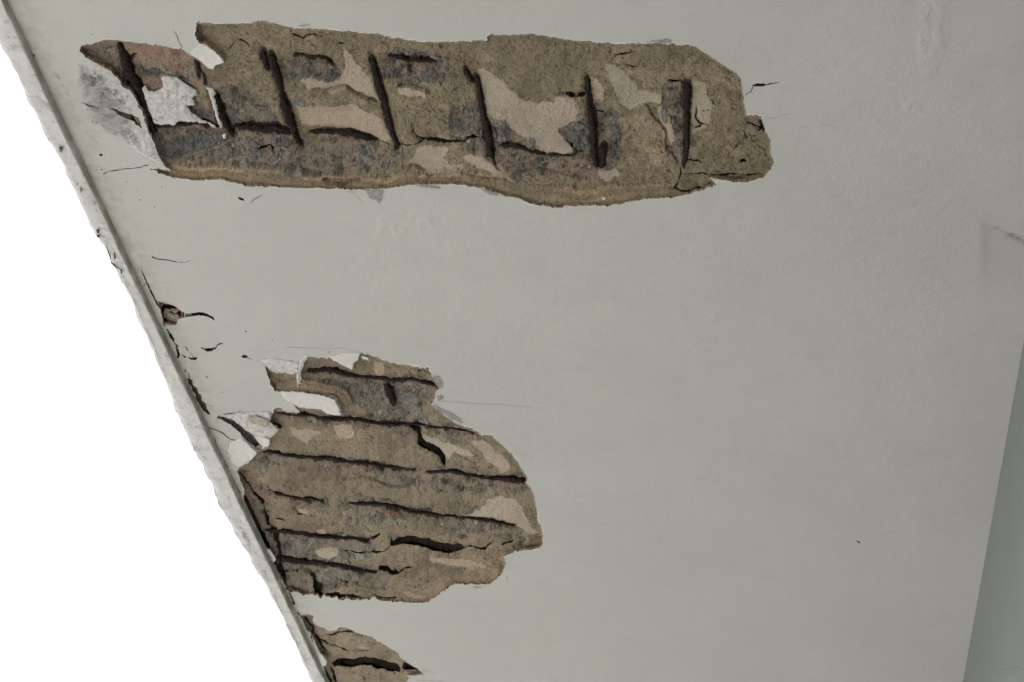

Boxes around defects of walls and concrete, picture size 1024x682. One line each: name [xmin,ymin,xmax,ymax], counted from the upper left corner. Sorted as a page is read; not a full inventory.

spalling [79,20,774,208]
crack [745,82,779,96]
spalling [154,297,214,334]
spalling [217,351,544,603]
spalling [300,614,423,682]